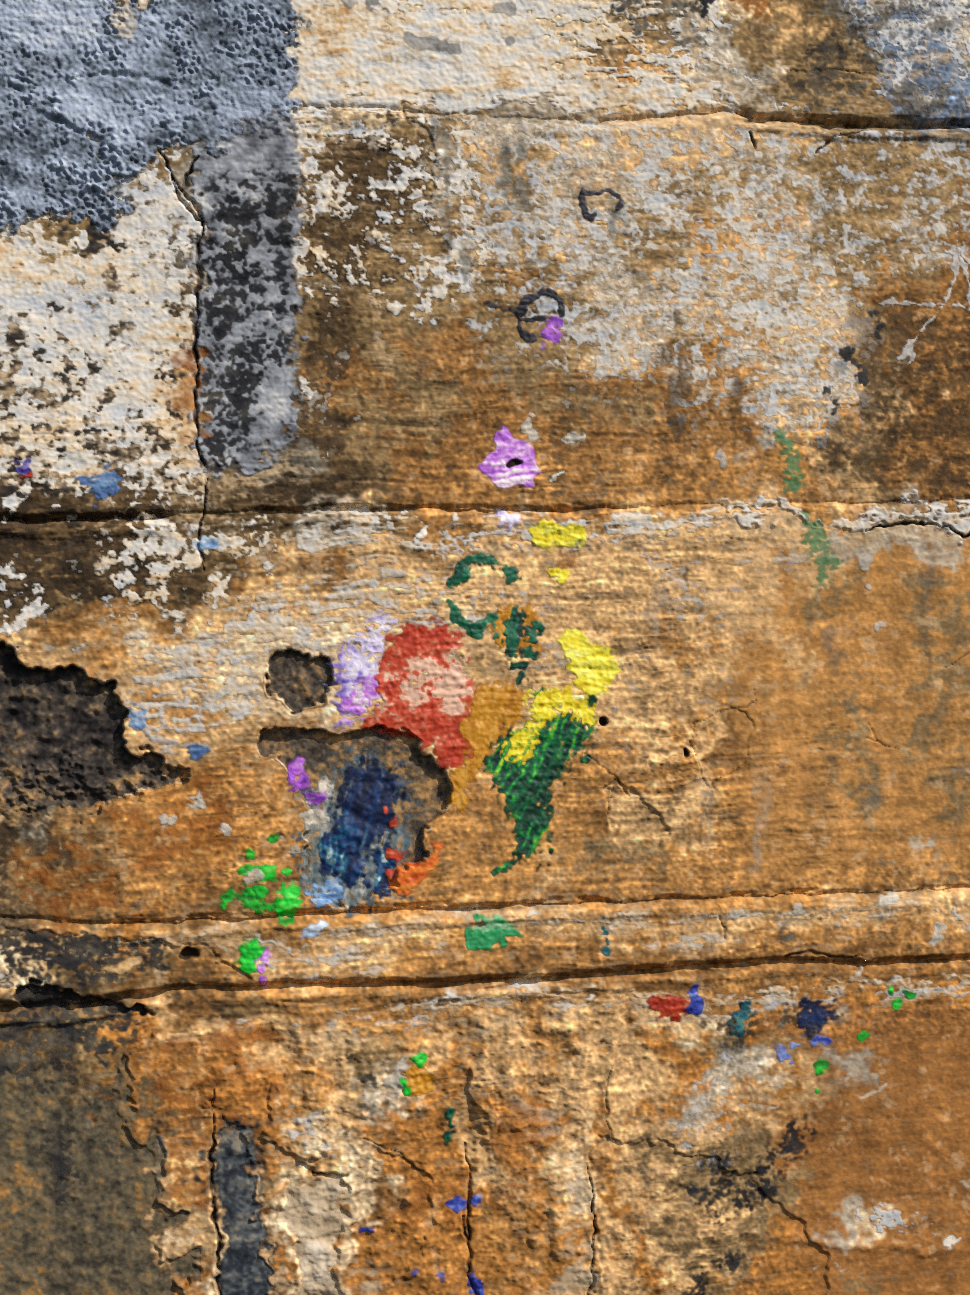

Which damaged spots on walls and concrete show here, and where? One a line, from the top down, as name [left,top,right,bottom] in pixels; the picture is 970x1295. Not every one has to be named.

crack [160,153,199,187]
crack [192,219,208,565]
peeling [0,147,970,981]